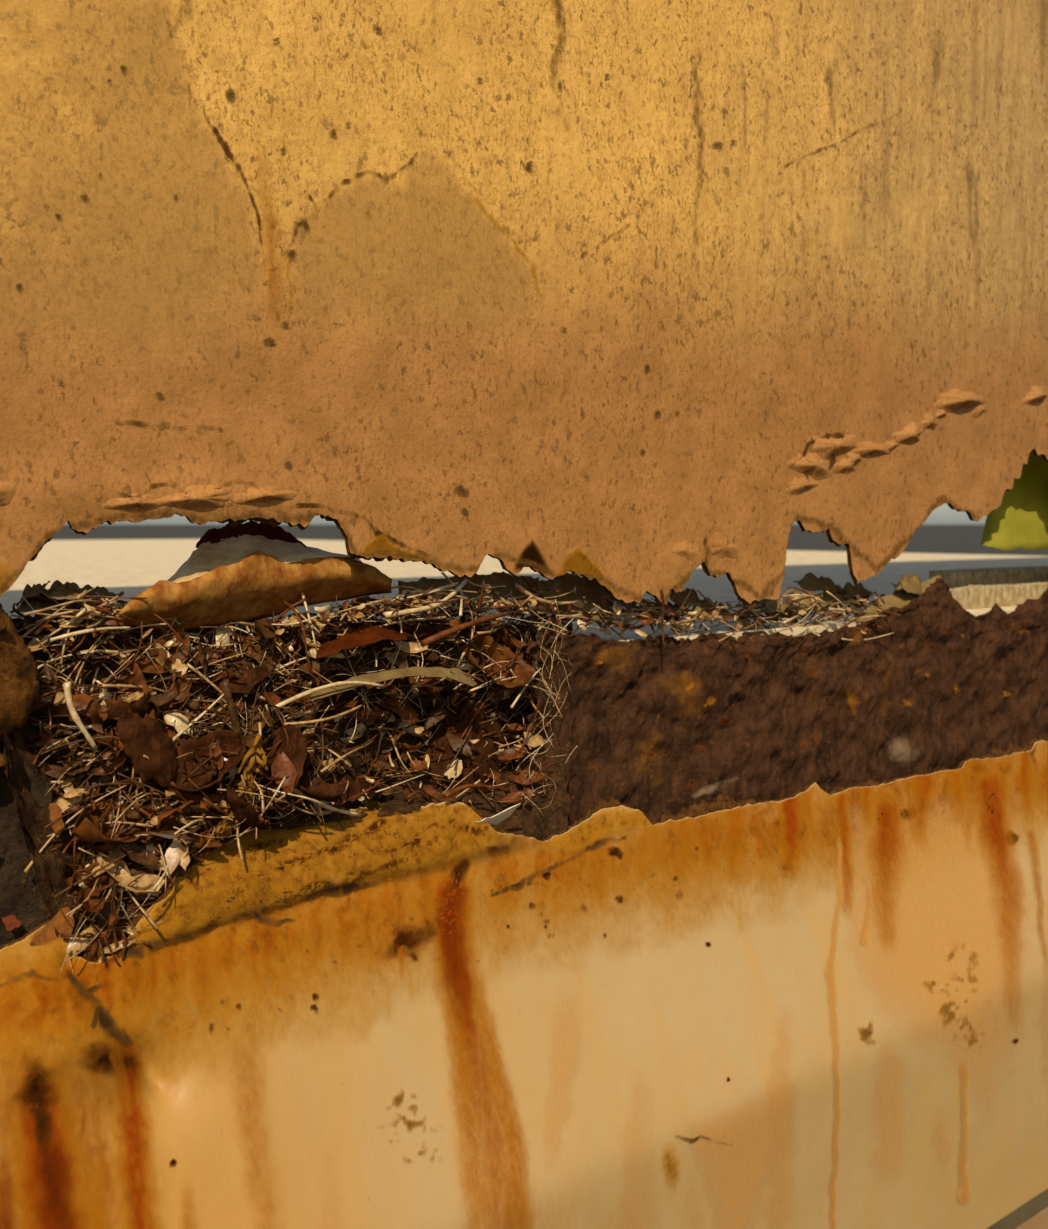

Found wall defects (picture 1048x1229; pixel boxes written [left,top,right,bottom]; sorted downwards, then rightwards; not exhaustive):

crack [202,107,262,242]
crack [292,152,418,241]
leakage [454,484,469,514]
peeling [516,541,612,591]
peeling [49,803,65,838]
peeling [132,803,520,941]
spalling [608,847,623,877]
peeling [1,915,21,931]
spalling [390,927,434,964]
corrosion [0,737,1048,1229]
spalling [860,1023,875,1044]
spalling [925,981,977,1046]